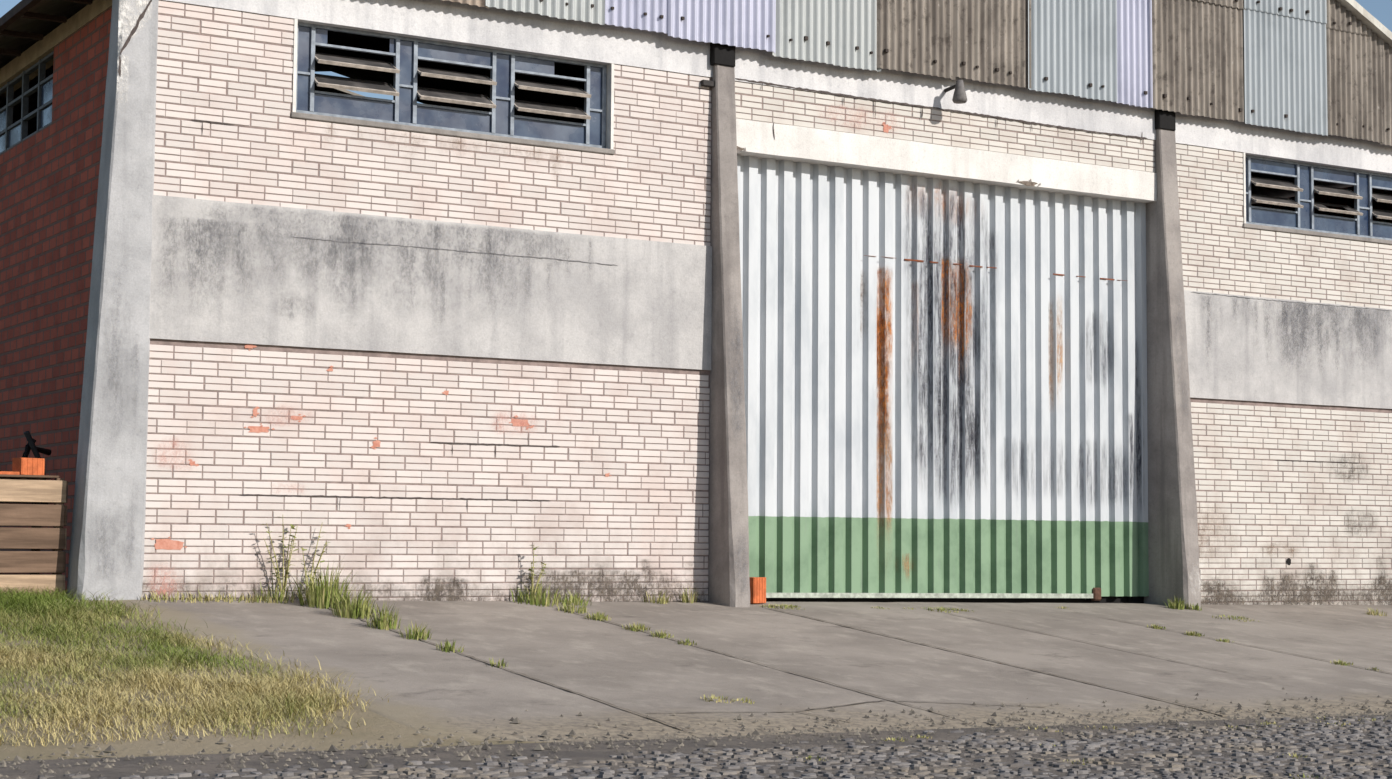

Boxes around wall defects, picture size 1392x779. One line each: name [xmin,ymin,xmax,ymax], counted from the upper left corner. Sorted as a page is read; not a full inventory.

corrosion [941,259,972,356]
corrosion [877,269,892,513]
peeling [244,406,274,433]
peeling [509,415,534,429]
peeling [151,537,187,550]
damp [1200,582,1232,604]
damp [1265,564,1337,604]
damp [1374,577,1392,604]